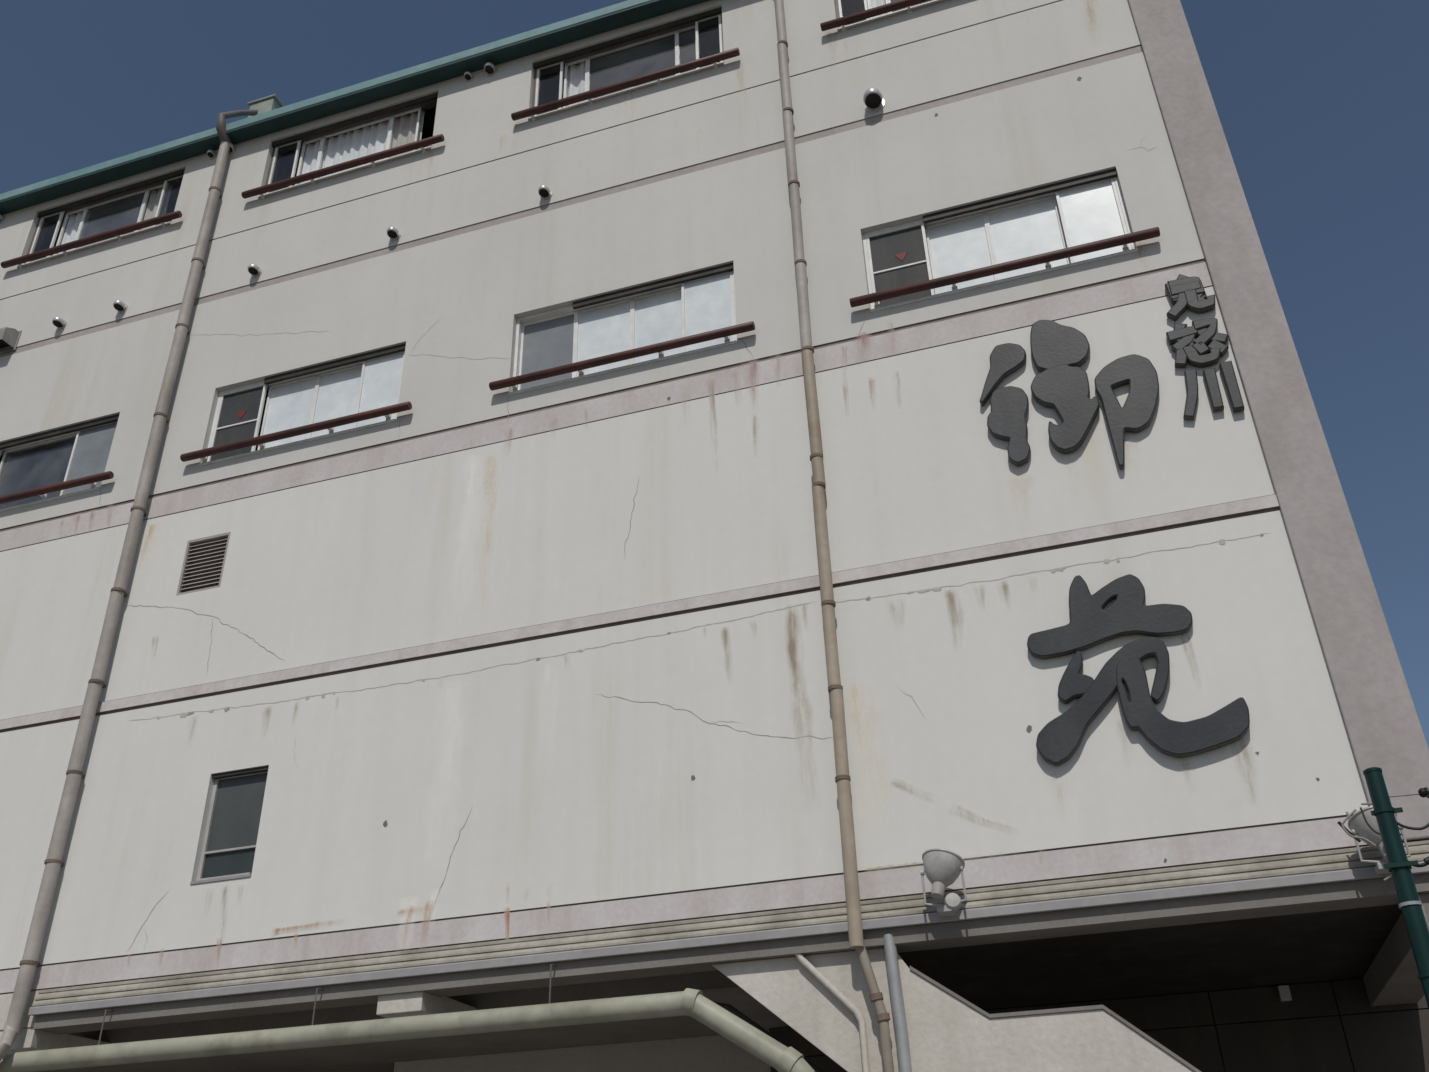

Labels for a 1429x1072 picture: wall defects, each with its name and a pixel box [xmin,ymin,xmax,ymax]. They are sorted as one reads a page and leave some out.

crack [123,605,280,670]
crack [600,694,833,739]
crack [434,815,469,908]